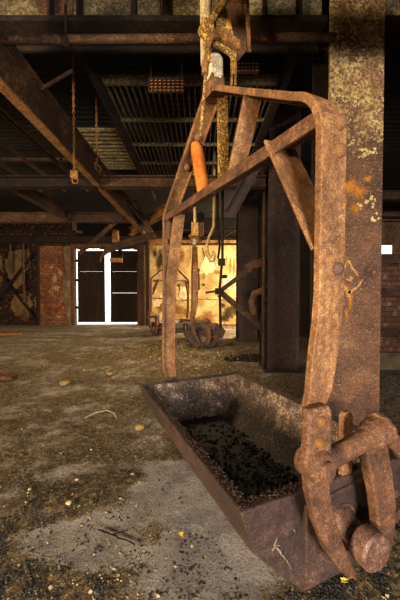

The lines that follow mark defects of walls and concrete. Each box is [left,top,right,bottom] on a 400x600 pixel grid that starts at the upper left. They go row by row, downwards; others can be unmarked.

corrosion [346,176,371,213]
peeling [0,248,36,321]
water stain [175,303,236,322]